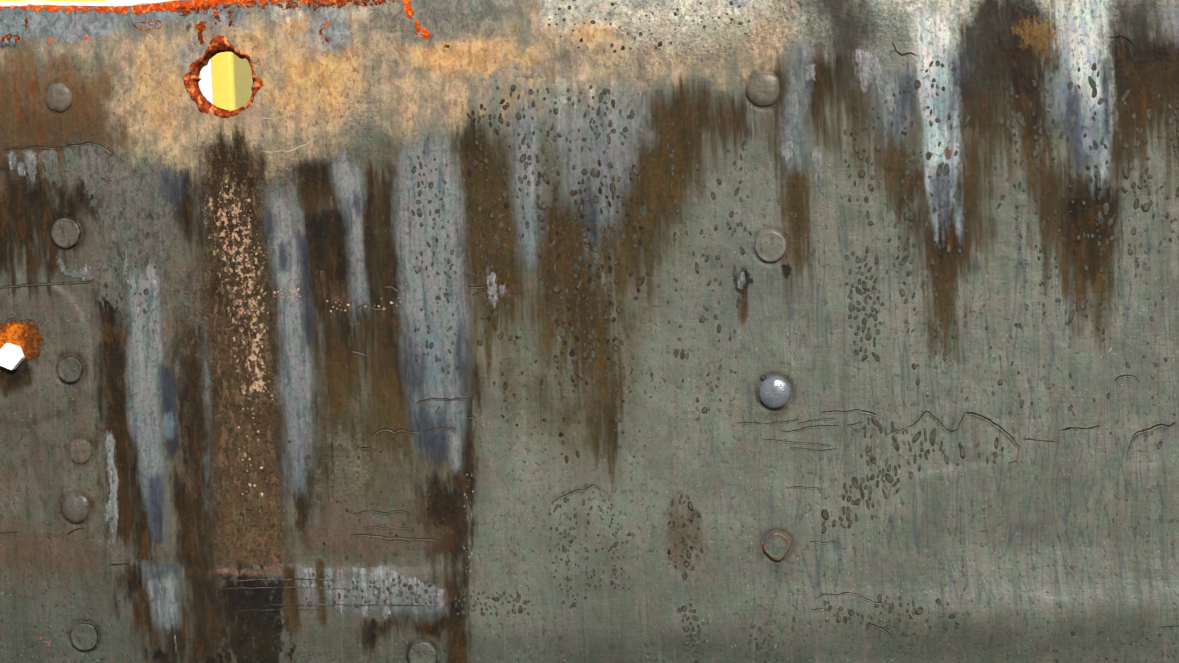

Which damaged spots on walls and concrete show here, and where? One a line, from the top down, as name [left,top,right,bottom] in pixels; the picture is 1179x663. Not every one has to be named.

rust [0,0,431,44]
leakage [774,0,1179,357]
rust [0,319,44,397]
rust [178,130,293,596]
leakage [0,79,748,663]